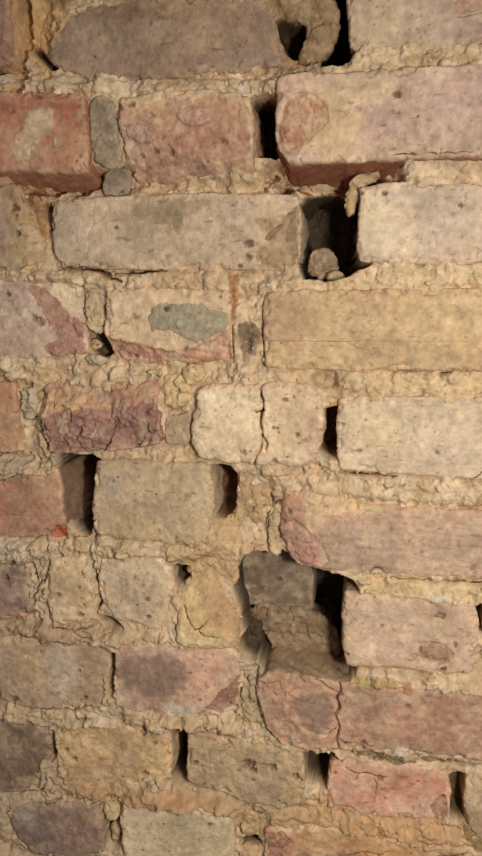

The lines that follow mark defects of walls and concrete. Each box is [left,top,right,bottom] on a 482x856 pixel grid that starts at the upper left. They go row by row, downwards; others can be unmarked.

spalling [276,18,306,61]
spalling [321,0,352,67]
spalling [256,195,359,282]
spalling [319,406,338,458]
spalling [216,464,238,518]
spalling [49,514,95,538]
crack [34,542,111,638]
spalling [236,556,271,663]
spalling [281,519,344,633]
crack [320,654,347,747]
spalling [306,751,330,785]
spalling [430,771,466,824]